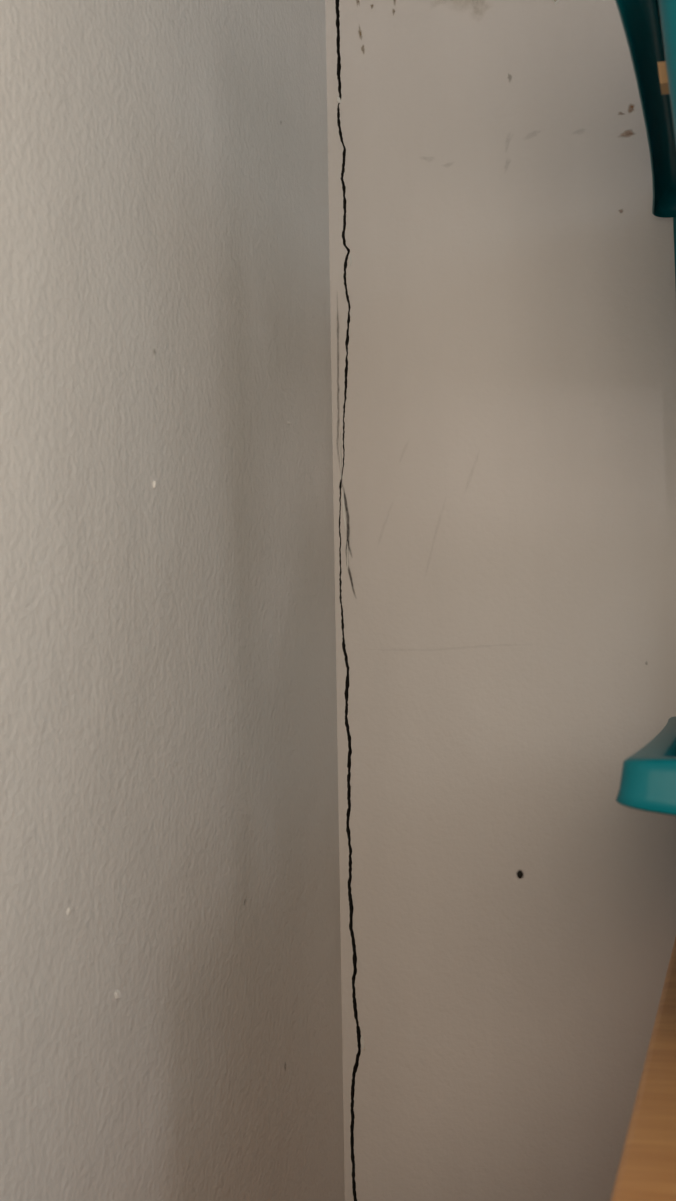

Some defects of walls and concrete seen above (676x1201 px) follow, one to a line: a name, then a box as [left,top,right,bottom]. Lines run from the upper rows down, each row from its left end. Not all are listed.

crack [335,0,365,1201]